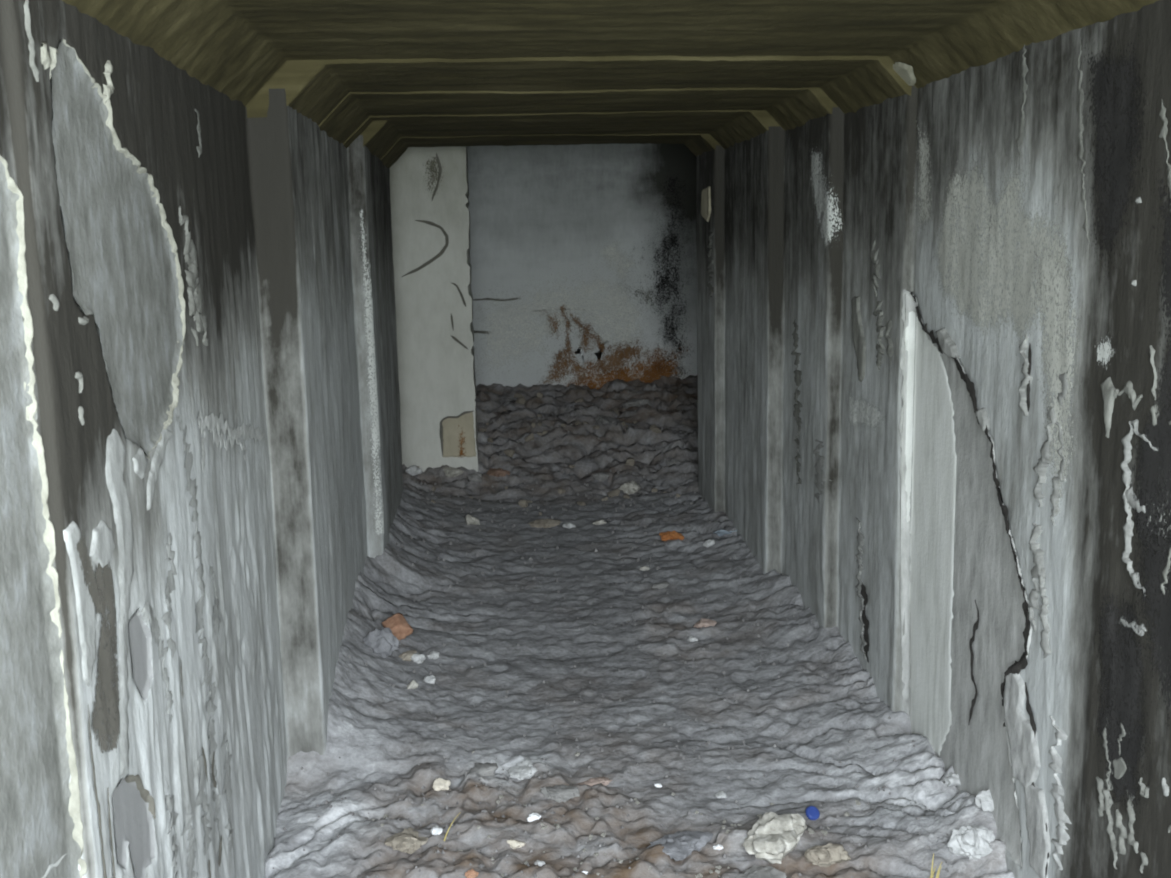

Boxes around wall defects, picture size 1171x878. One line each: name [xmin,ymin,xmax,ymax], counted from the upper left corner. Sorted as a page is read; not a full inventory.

flaking render [0,0,233,878]
damp [473,172,696,380]
rust [538,305,688,390]
damp [1077,34,1171,813]
peeling [1097,336,1171,596]
peeling [1119,615,1147,636]
peeling [1096,723,1169,873]